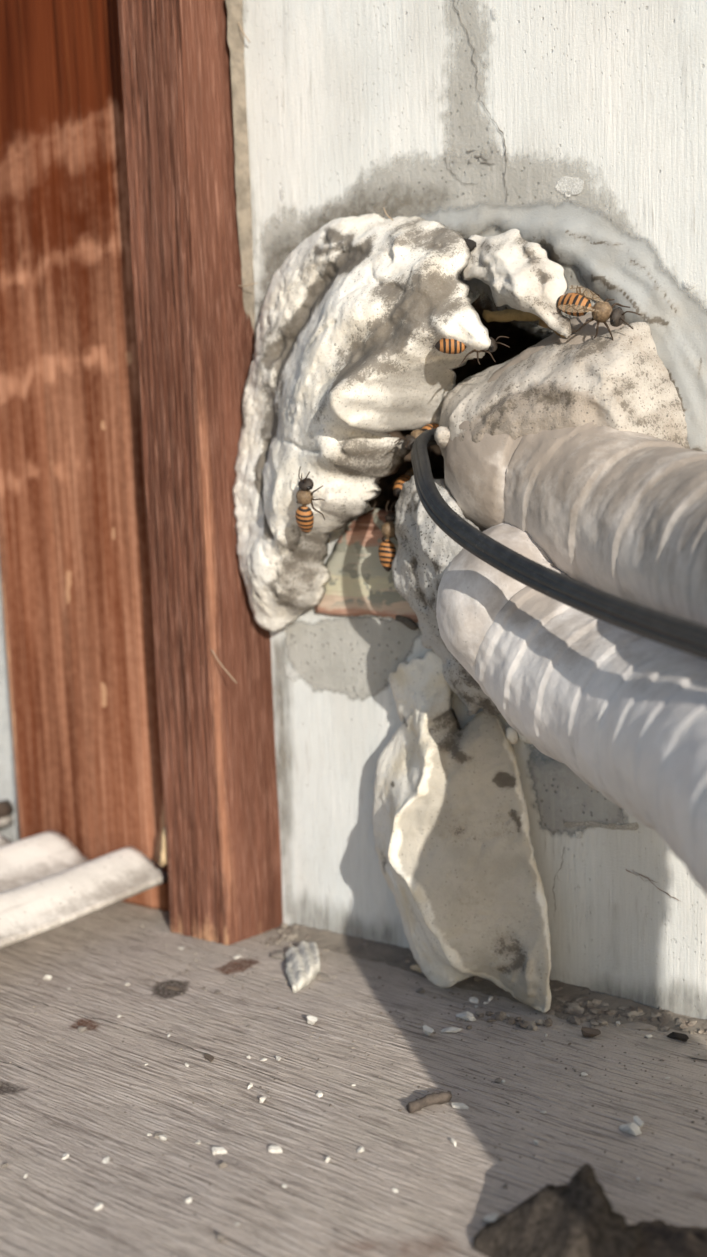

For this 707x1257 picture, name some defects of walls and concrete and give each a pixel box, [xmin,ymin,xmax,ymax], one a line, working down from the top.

peeling [261,0,637,279]
crack [445,0,507,202]
damp [258,195,431,316]
peeling [460,274,514,311]
peeling [541,245,598,319]
peeling [285,615,422,700]
peeling [505,727,638,838]